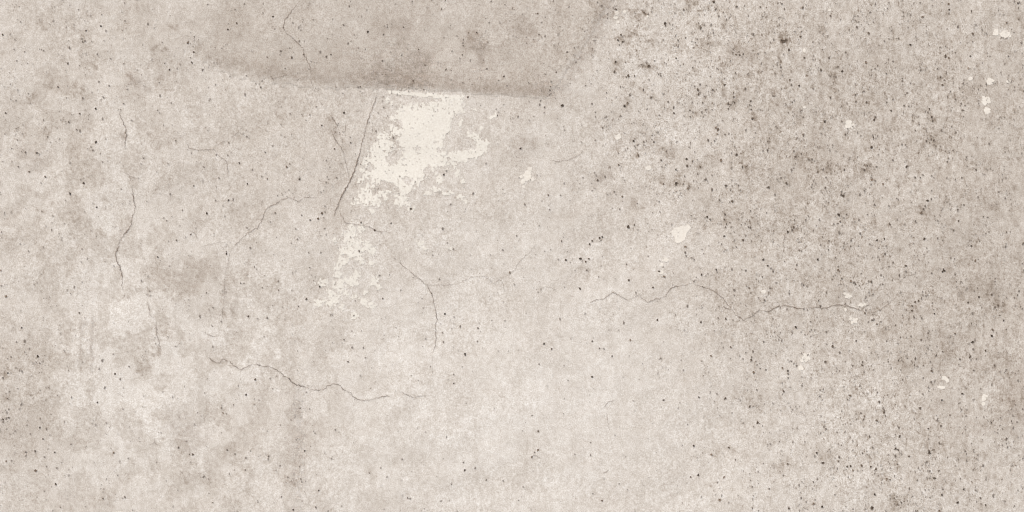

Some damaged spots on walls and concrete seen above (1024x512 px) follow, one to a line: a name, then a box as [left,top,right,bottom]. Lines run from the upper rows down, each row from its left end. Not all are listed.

peeling [350,91,497,214]
peeling [308,219,382,319]